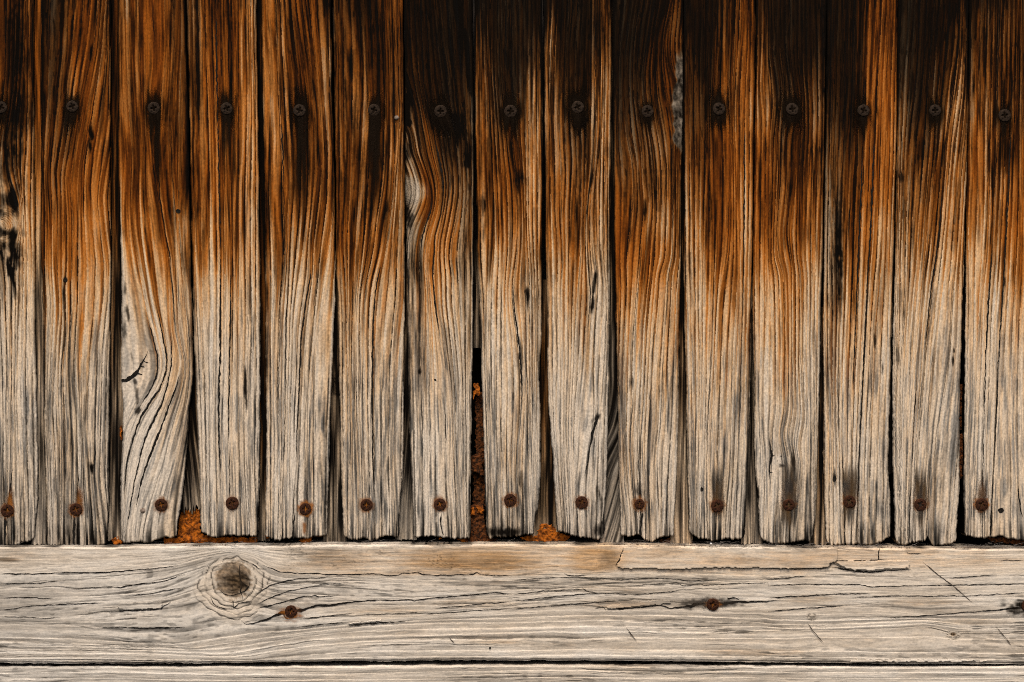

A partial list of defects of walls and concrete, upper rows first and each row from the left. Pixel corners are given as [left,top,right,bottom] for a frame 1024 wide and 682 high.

crack [121,311,179,524]
corrosion [457,383,498,542]
corrosion [164,508,270,544]
corrosion [297,501,322,543]
corrosion [520,524,570,542]
crack [4,565,184,629]
crack [211,512,1020,627]